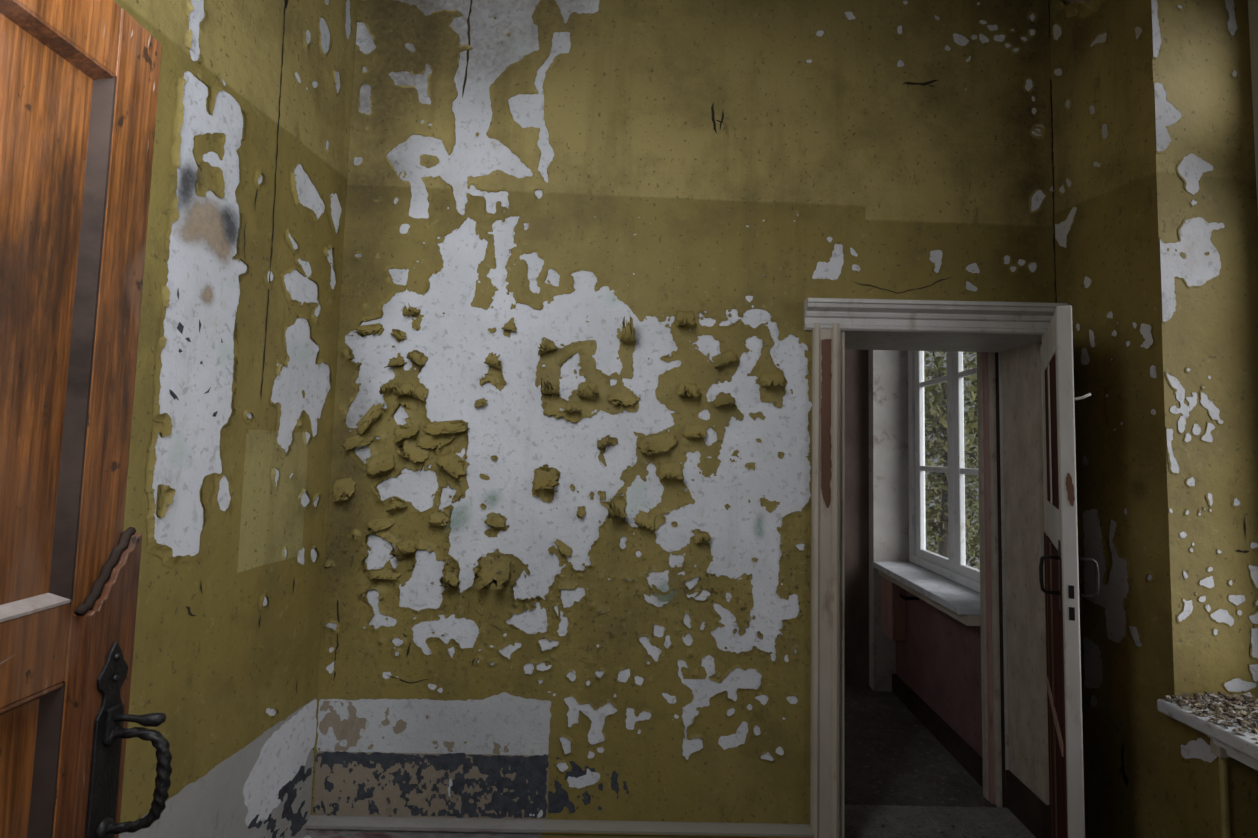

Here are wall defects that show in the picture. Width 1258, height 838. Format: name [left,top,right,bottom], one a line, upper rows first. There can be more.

peeling [942,0,1038,65]
peeling [1133,0,1163,59]
peeling [1154,82,1182,153]
peeling [1028,177,1078,248]
peeling [785,234,860,299]
peeling [928,247,946,275]
peeling [962,263,983,294]
peeling [1001,254,1038,274]
peeling [1106,153,1225,363]
peeling [119,0,832,838]
peeling [1150,365,1225,516]
peeling [1177,549,1258,696]